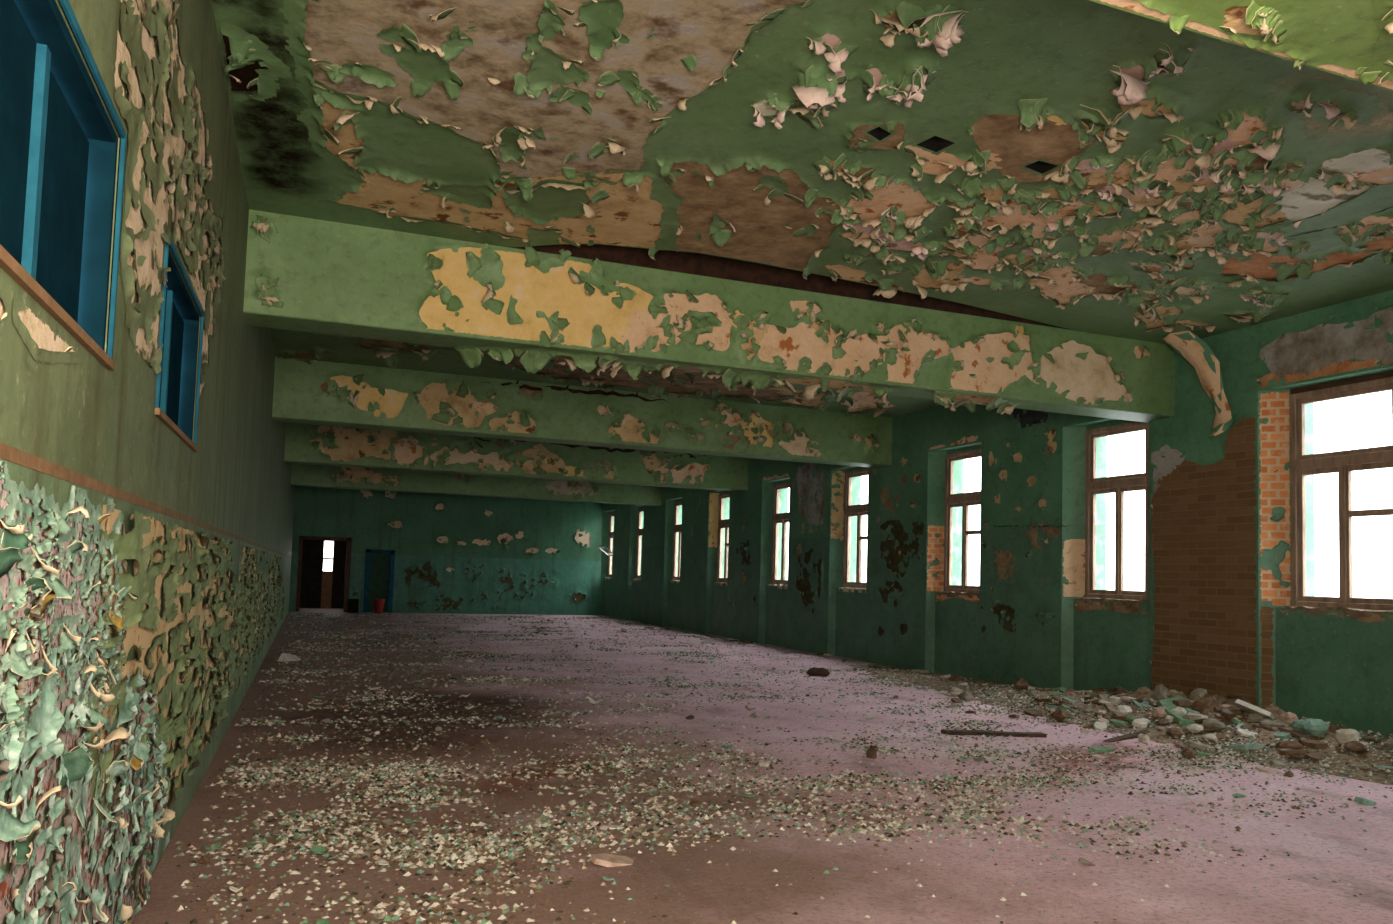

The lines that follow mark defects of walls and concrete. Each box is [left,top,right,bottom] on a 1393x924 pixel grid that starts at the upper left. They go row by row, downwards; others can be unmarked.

peeling [0,288,83,365]
peeling [114,0,226,408]
leakage [234,0,309,192]
crack [512,244,1071,330]
peeling [220,0,1393,709]
peeling [0,461,285,924]